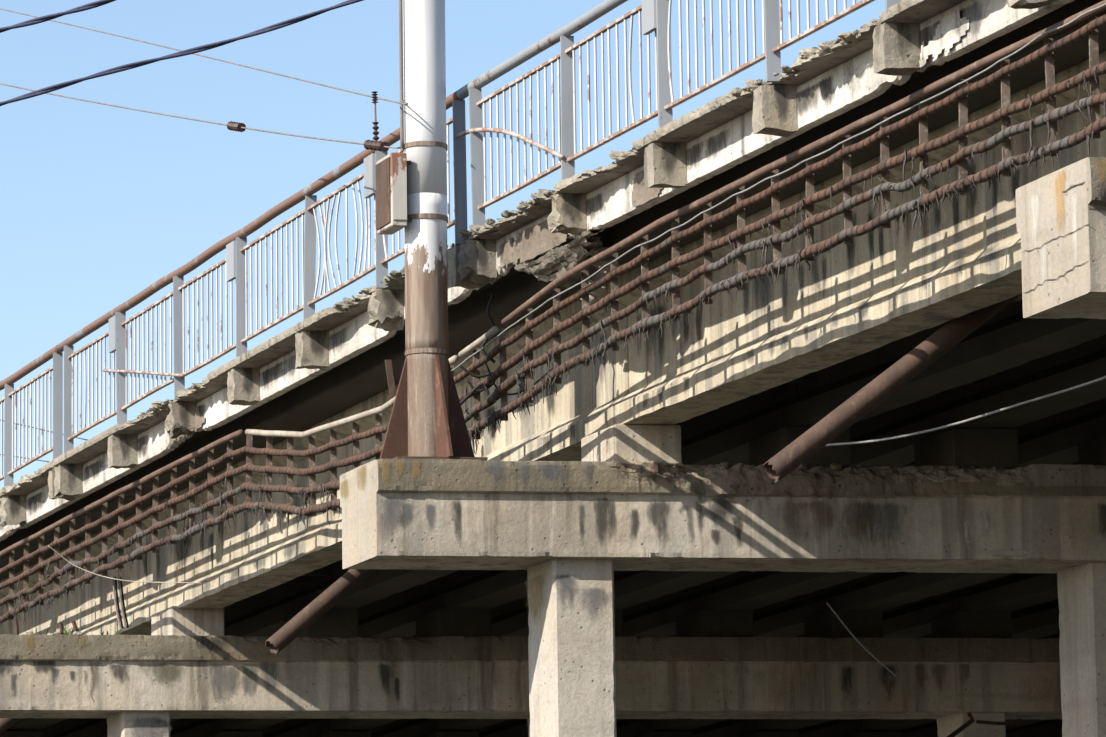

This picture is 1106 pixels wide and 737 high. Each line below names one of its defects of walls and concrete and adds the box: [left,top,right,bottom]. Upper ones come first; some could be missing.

spalling [919,9,969,67]
water stain [564,193,603,222]
water stain [953,166,976,231]
rust [1056,172,1065,217]
spalling [503,220,604,288]
water stain [868,214,883,266]
spalling [608,461,685,475]
spalling [703,463,875,497]
spalling [895,464,1106,486]
water stain [579,499,615,539]
water stain [631,501,668,536]
water stain [686,496,742,543]